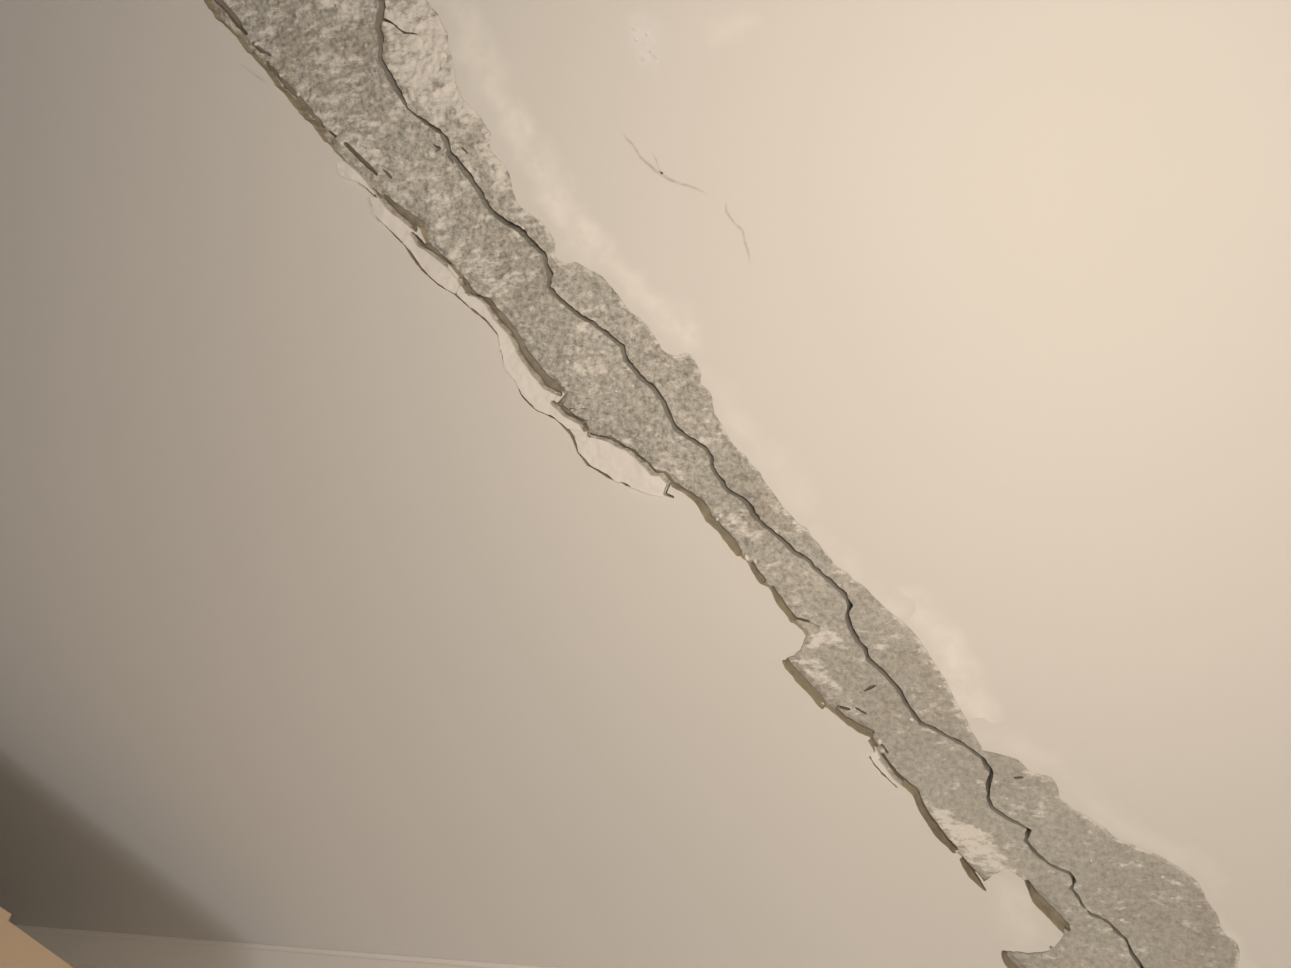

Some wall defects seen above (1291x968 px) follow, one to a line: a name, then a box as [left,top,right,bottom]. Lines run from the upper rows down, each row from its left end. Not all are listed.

spalling [210,0,1240,968]
crack [374,0,1144,968]